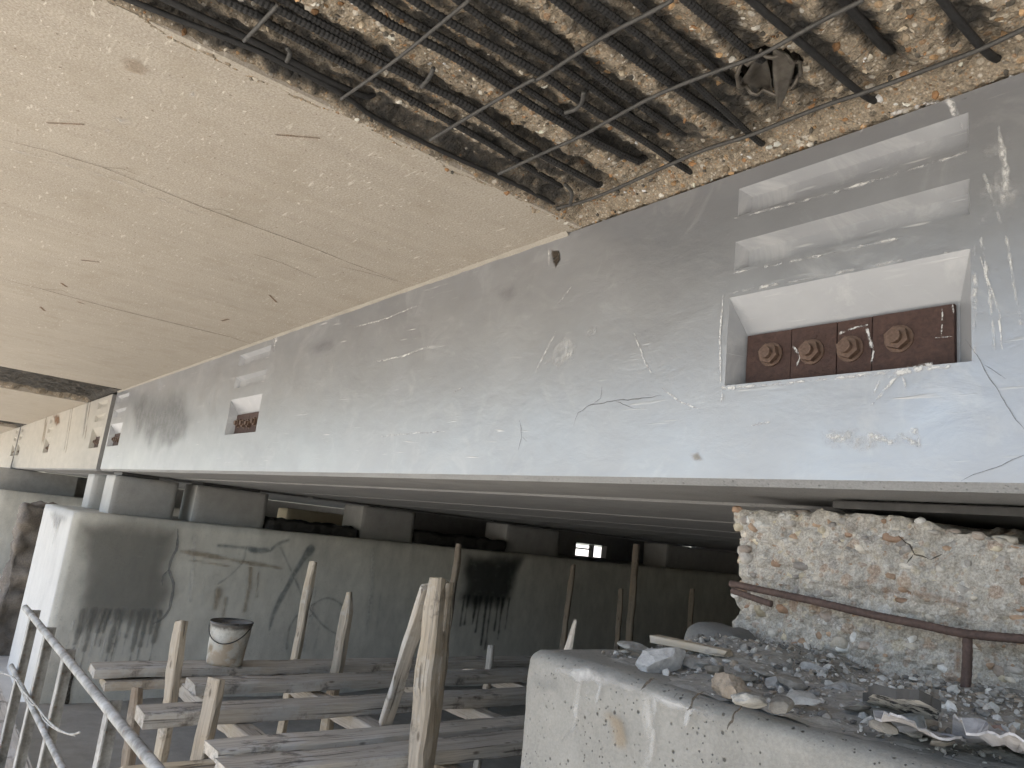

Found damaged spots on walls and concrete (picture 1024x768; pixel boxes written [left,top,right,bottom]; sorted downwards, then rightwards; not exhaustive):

spalling [92,0,1024,231]
crack [576,390,658,417]
crack [968,343,1016,420]
leakage [74,529,169,653]
leakage [460,558,521,648]
corrosion [729,580,1024,687]
crack [899,536,942,563]